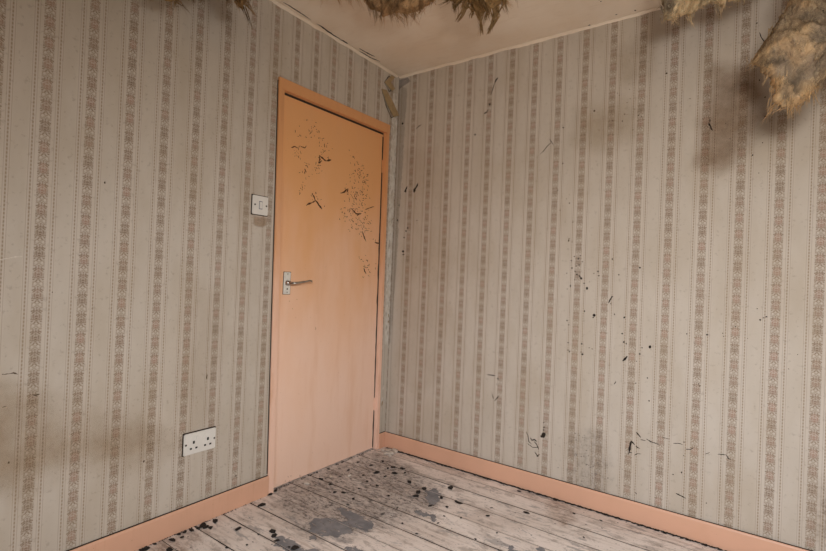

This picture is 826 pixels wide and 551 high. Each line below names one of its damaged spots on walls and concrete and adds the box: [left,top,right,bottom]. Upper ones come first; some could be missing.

peeling [414,488,442,522]
peeling [273,508,374,551]